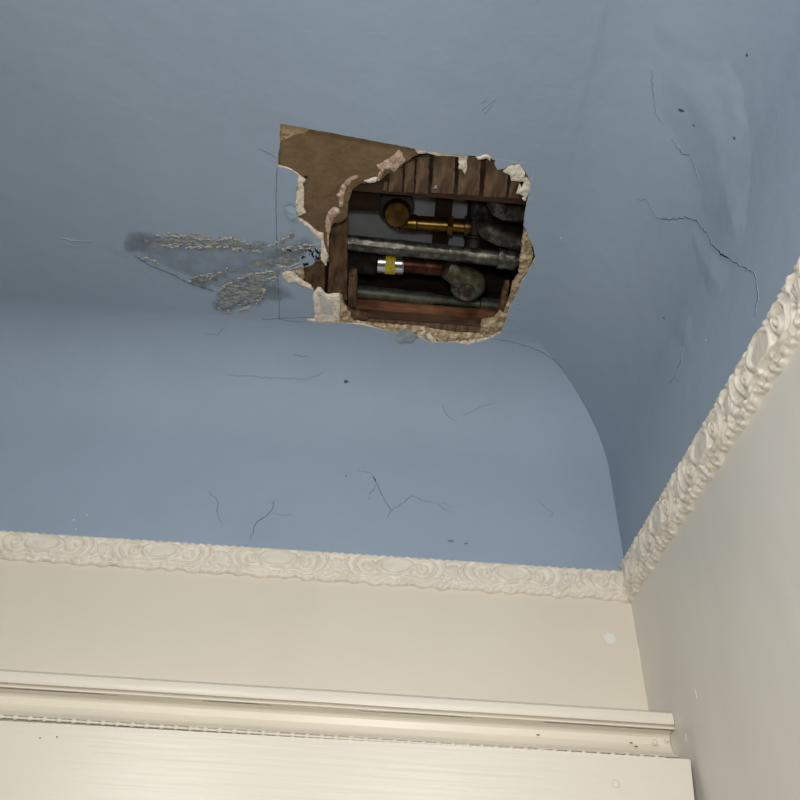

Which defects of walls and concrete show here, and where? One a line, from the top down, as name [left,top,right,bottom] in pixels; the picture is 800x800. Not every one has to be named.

flaking render [134,124,533,345]
crack [658,216,759,317]
crack [363,471,454,518]